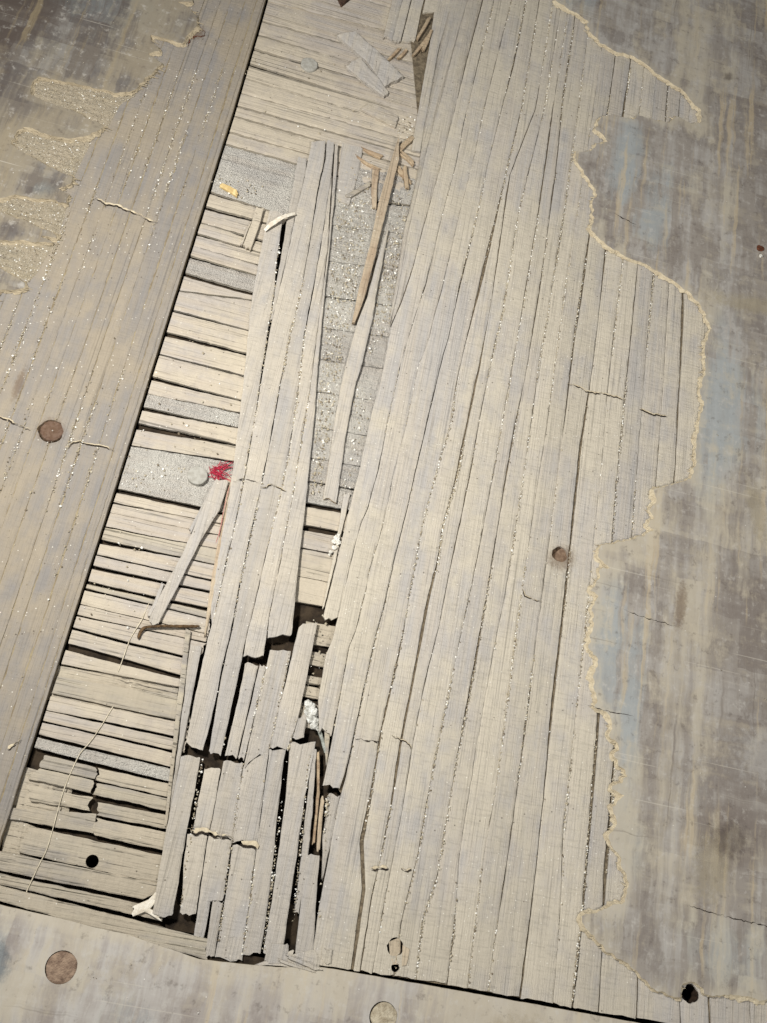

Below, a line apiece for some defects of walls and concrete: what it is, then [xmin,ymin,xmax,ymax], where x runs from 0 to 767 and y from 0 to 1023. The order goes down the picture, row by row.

crack [574,384,666,417]
peeling [0,0,266,847]
peeling [180,0,767,1023]
crack [356,736,411,749]
crack [186,827,260,851]
crack [372,864,411,872]